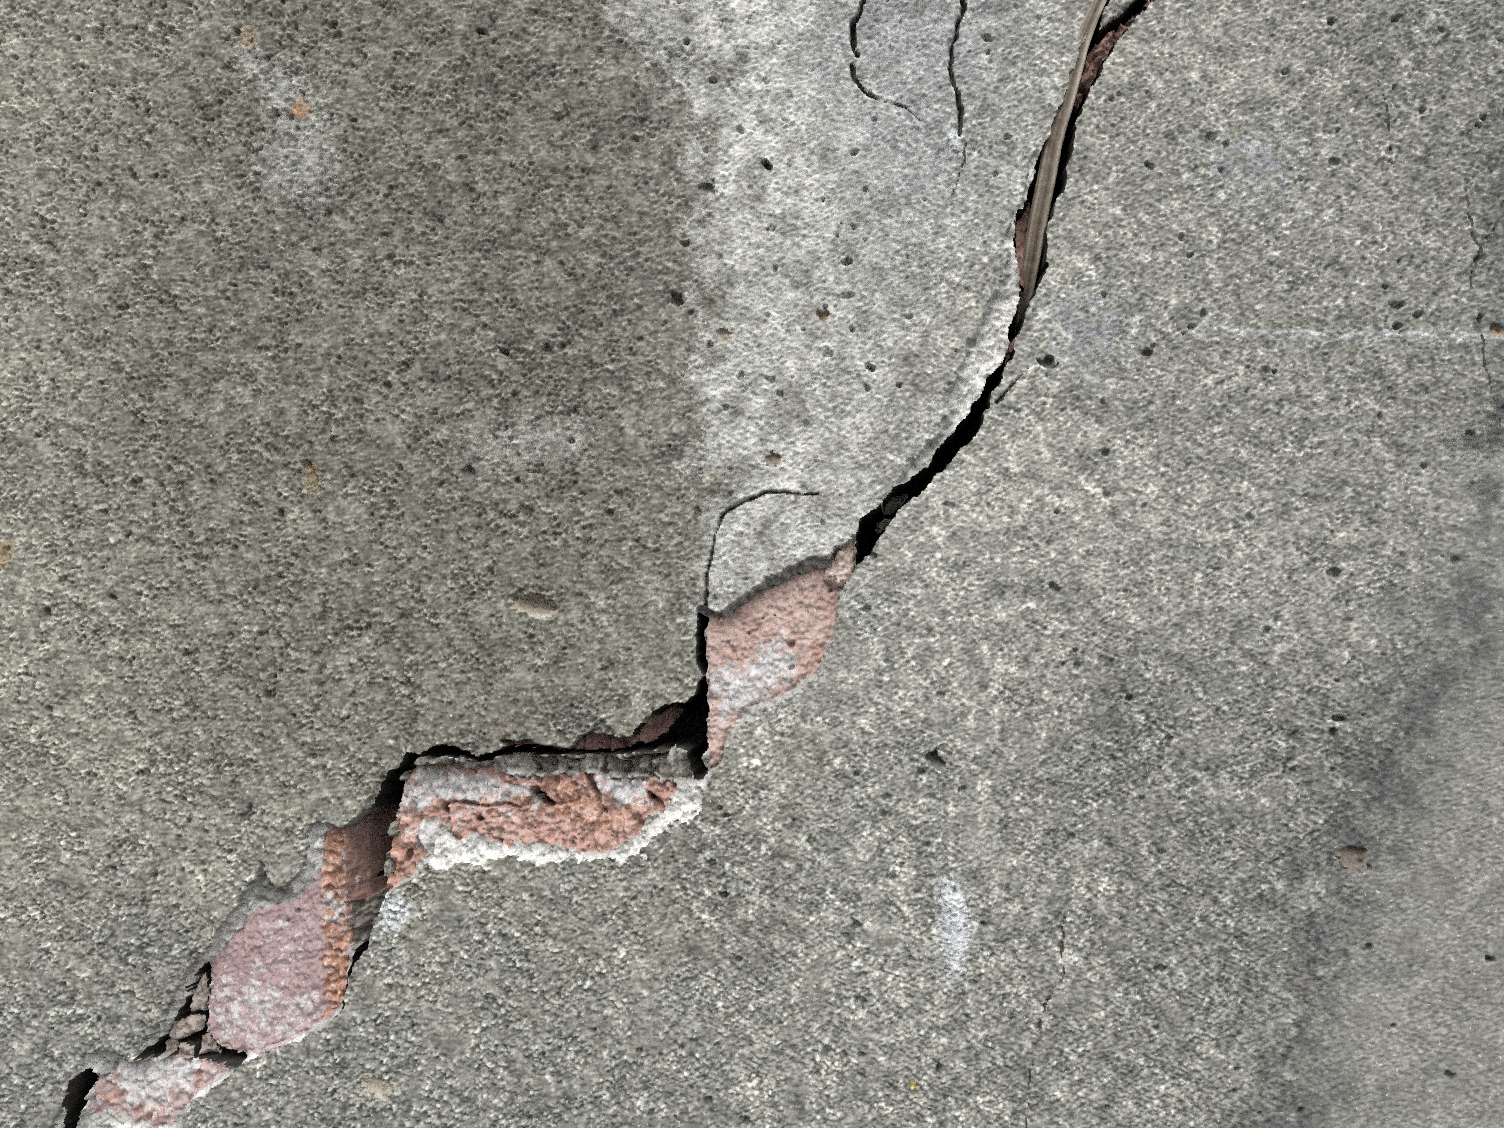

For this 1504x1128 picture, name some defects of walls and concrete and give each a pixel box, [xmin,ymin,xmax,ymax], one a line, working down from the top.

crack [849,0,1154,565]
crack [54,961,248,1128]
crack [340,920,376,1014]
spalling [78,534,858,1128]
crack [374,491,819,885]
crack [1025,917,1067,1128]